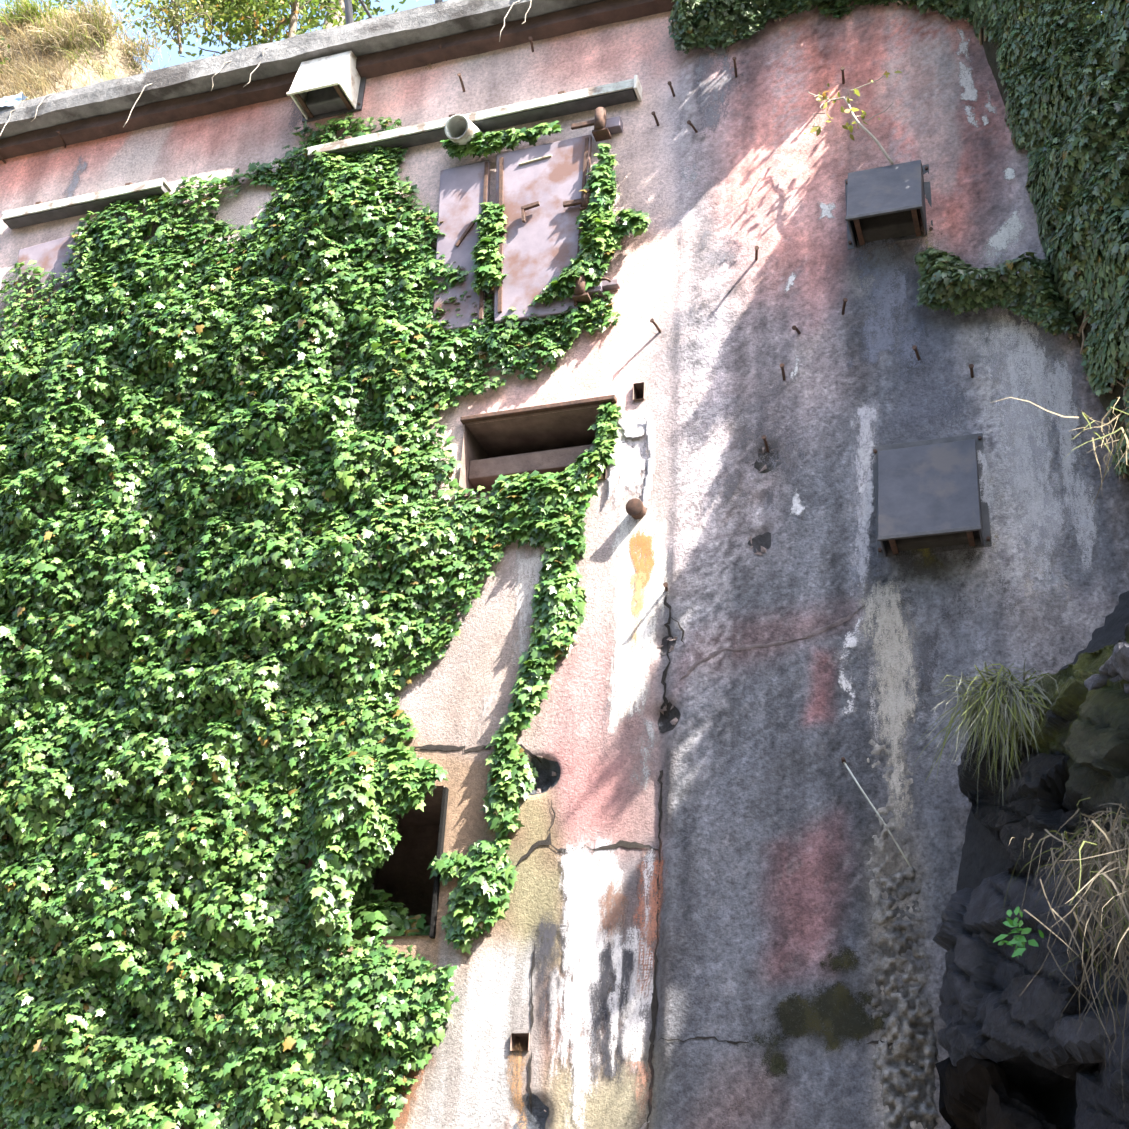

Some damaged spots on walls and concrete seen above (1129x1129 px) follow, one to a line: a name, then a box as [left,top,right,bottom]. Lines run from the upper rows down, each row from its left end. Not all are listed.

peeling [606,410,656,509]
corrosion [629,530,655,643]
crack [661,595,684,730]
spalling [528,756,560,795]
damp [533,834,657,1129]
corrosion [598,846,664,998]
crack [516,770,749,1129]
corrosion [628,1060,652,1112]